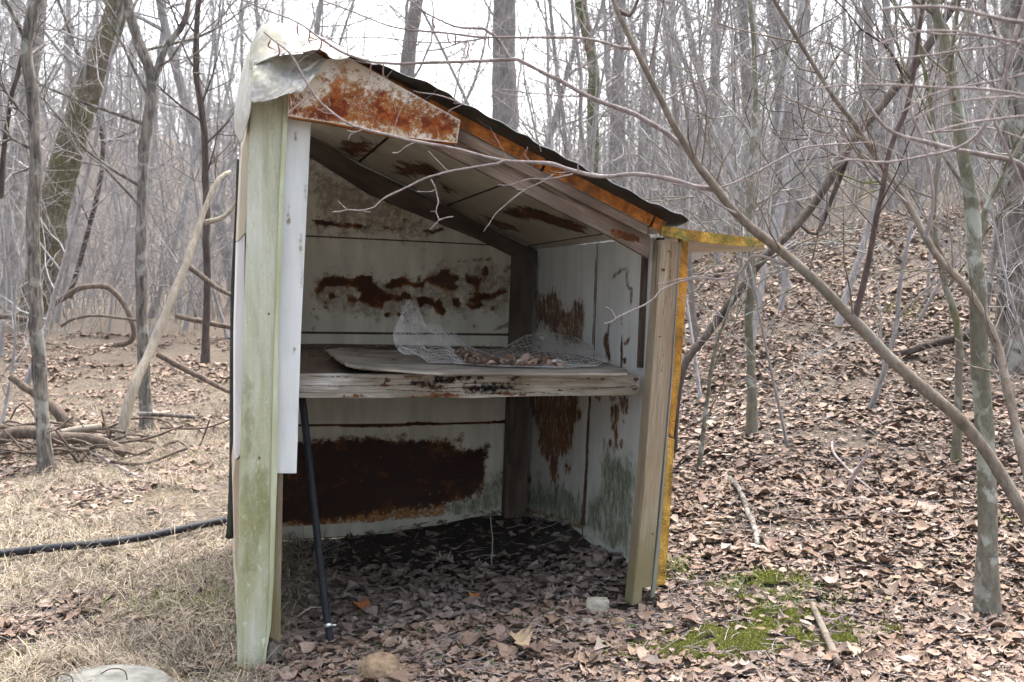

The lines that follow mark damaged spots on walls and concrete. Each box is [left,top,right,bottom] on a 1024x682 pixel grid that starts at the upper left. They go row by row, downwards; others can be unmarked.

corrosion [289,60,459,158]
corrosion [481,203,590,236]
corrosion [313,258,507,318]
corrosion [535,259,630,368]
corrosion [282,420,505,527]
corrosion [526,396,628,528]